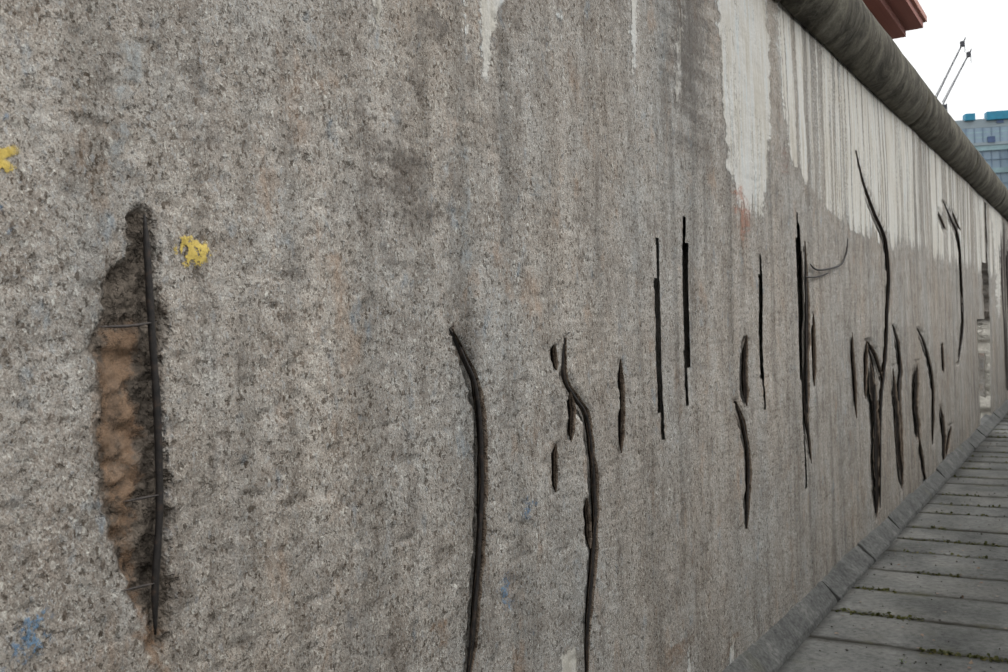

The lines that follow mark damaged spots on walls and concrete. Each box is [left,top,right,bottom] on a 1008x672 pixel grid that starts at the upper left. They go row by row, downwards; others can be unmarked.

crack [449,328,488,672]
crack [550,337,600,672]
crack [618,359,626,453]
crack [734,335,752,529]
crack [803,238,848,464]
crack [850,150,964,518]